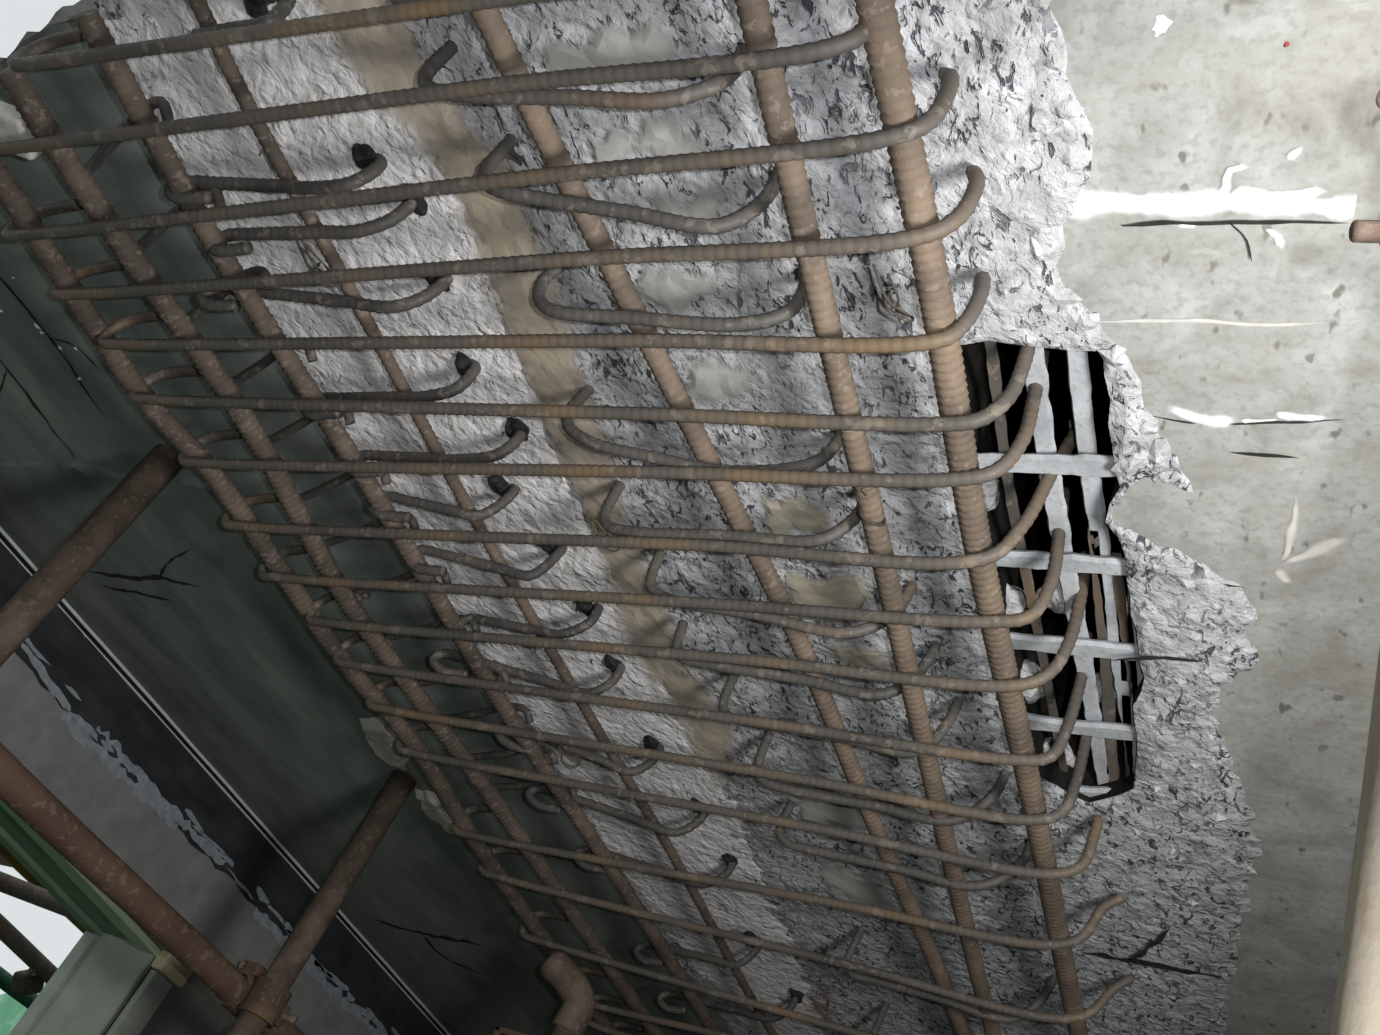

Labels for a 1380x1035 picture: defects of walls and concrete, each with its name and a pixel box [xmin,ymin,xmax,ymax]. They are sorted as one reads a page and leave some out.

crack [89,548,198,601]
spalling [73,0,253,49]
spalling [99,30,449,211]
spalling [0,67,665,1035]
corrosion [320,0,730,772]
spalling [189,0,1263,1035]